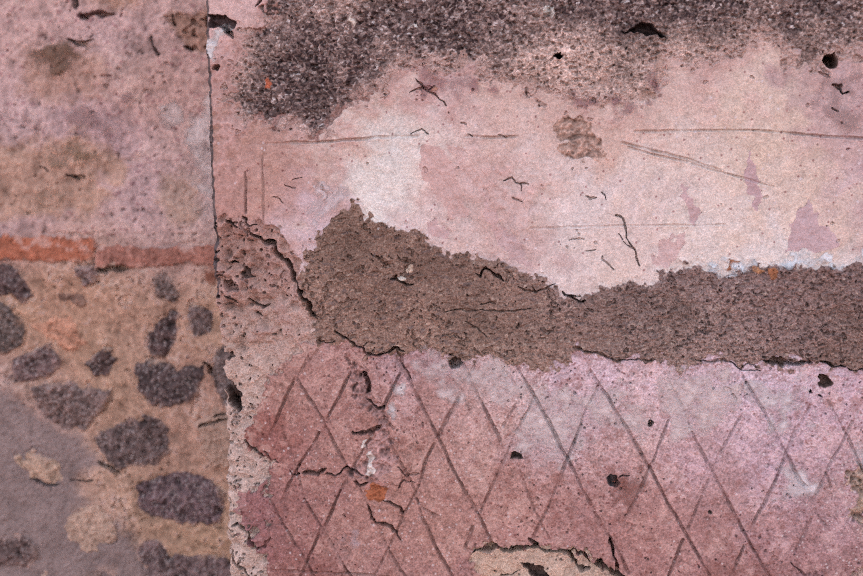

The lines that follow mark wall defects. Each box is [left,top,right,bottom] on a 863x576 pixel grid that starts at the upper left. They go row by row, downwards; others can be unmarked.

spalling [221,0,863,163]
crack [226,216,316,314]
crack [373,255,413,285]
peeling [419,144,533,267]
peeling [651,183,701,268]
peeling [785,199,840,253]
spalling [214,214,317,576]
crack [319,338,411,377]
flaking render [299,356,419,539]
spalling [844,463,863,524]
spalling [469,541,623,576]
crack [482,537,625,576]